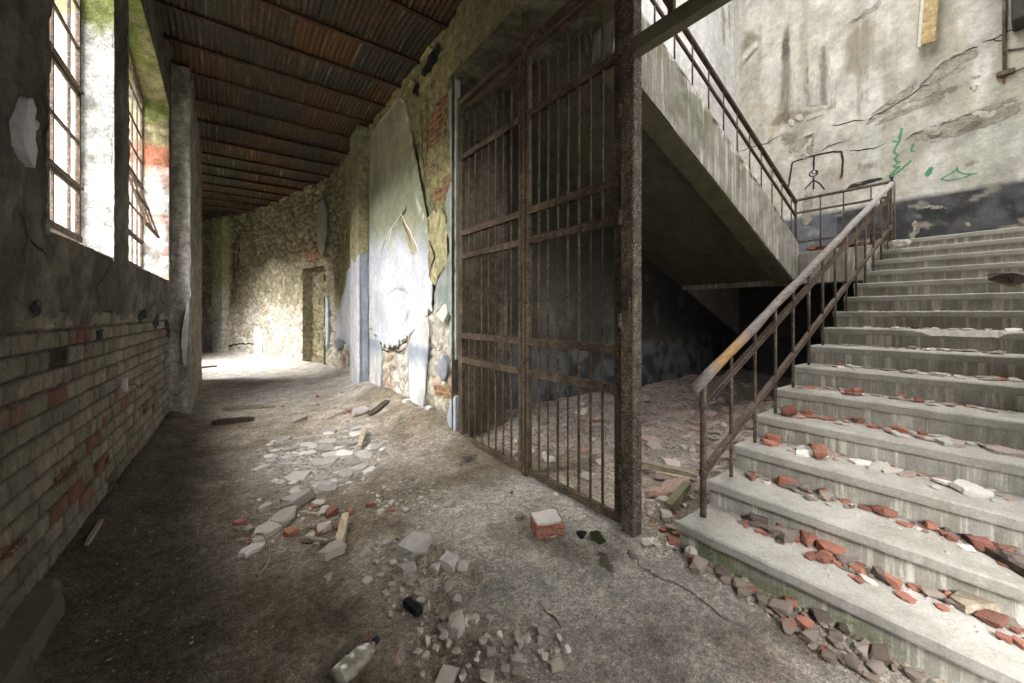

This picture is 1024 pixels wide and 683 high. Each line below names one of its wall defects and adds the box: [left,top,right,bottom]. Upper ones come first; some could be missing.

water stain [774,27,834,124]
crack [822,120,885,151]
flaking render [867,46,981,126]
flaking render [905,98,1021,143]
flaking render [325,42,461,432]